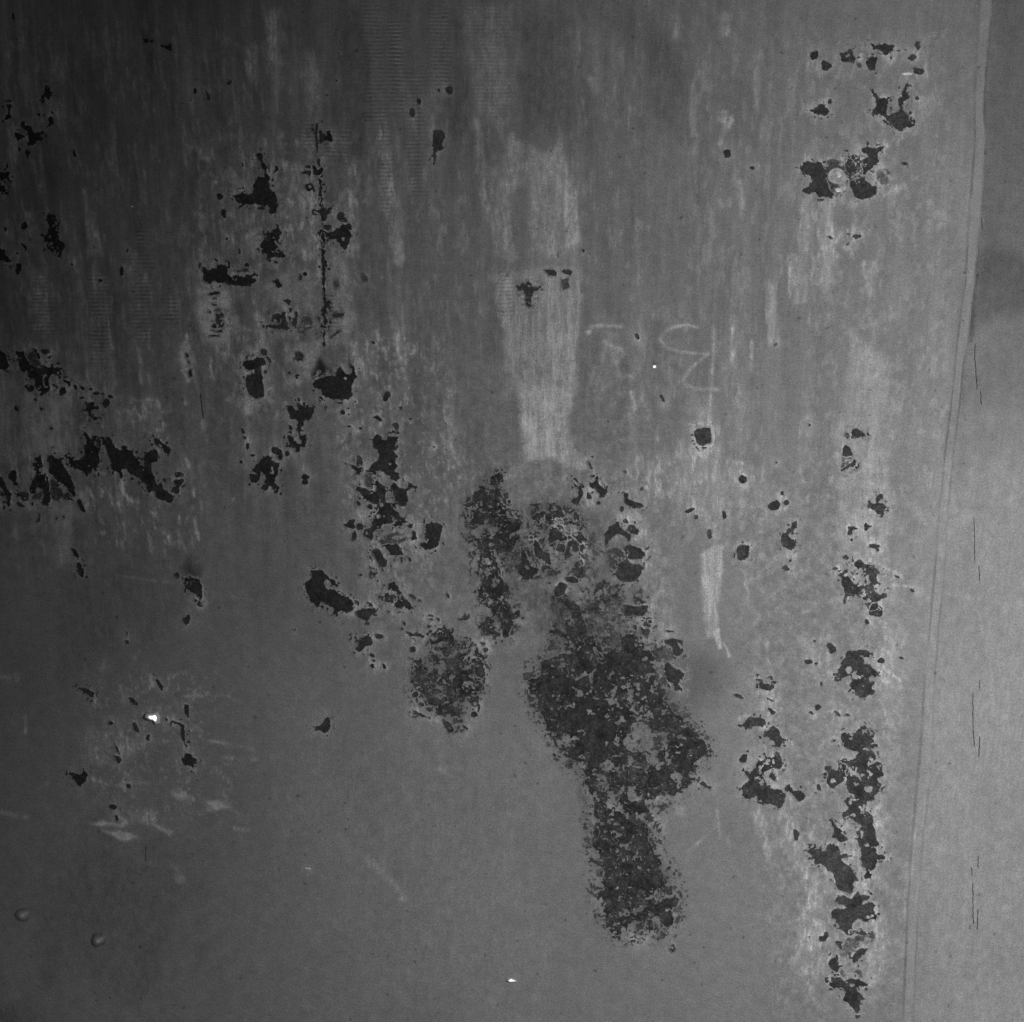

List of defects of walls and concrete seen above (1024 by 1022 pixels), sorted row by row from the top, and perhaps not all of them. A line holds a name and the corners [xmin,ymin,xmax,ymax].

peeling [793,37,926,207]
peeling [0,344,190,525]
peeling [839,423,872,478]
peeling [197,147,721,953]
peeling [830,488,916,627]
peeling [731,638,906,1019]